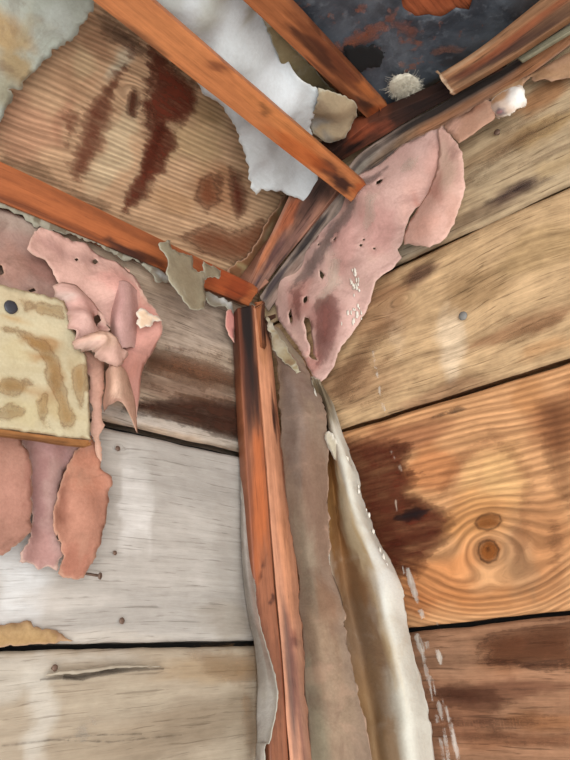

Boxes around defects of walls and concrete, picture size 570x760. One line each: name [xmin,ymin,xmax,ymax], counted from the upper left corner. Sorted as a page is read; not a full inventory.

corrosion [336,17,415,52]
damp [75,82,115,173]
damp [108,25,196,213]
damp [231,176,244,214]
damp [191,219,262,260]
peeling [341,268,362,326]
damp [347,442,447,574]
crack [47,668,158,680]